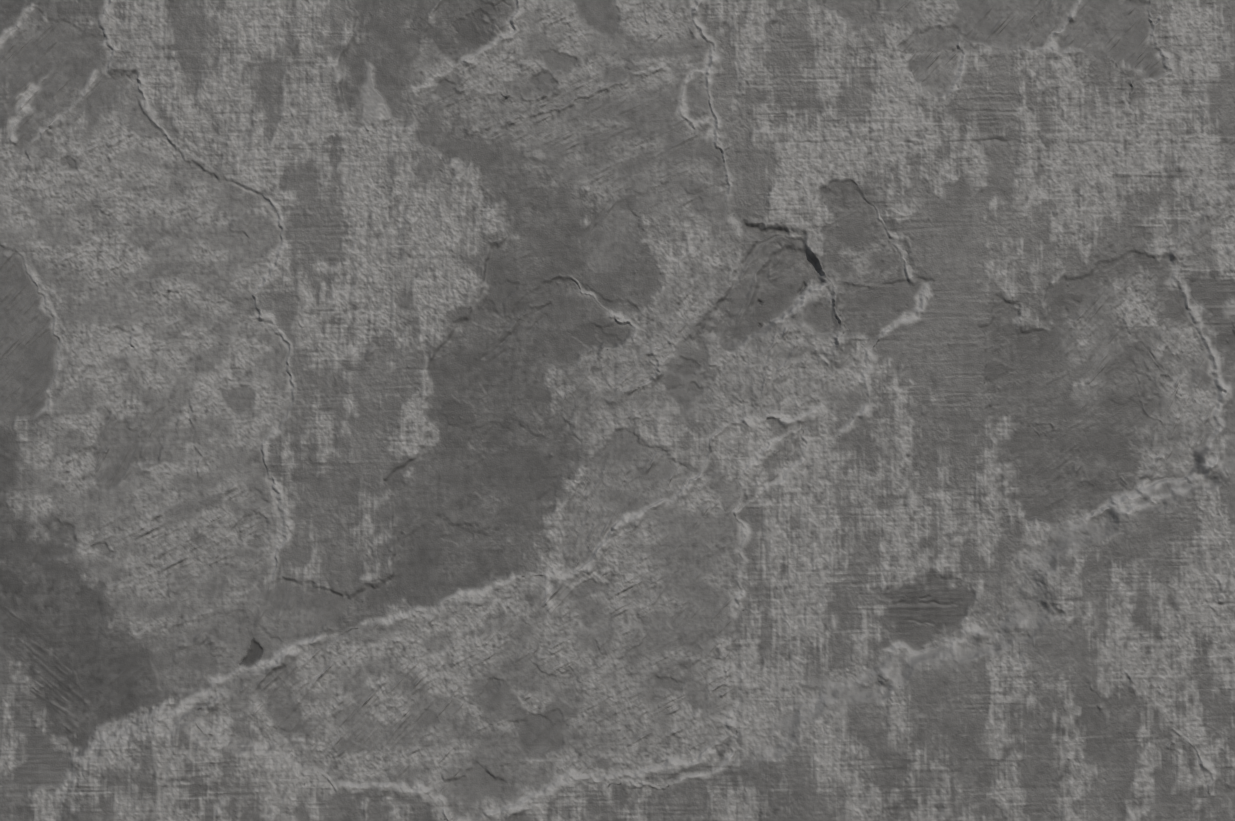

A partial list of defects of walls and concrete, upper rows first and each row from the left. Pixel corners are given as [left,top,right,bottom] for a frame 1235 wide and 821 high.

spalling [0,0,934,821]
peeling [980,252,1235,528]
peeling [883,570,976,652]